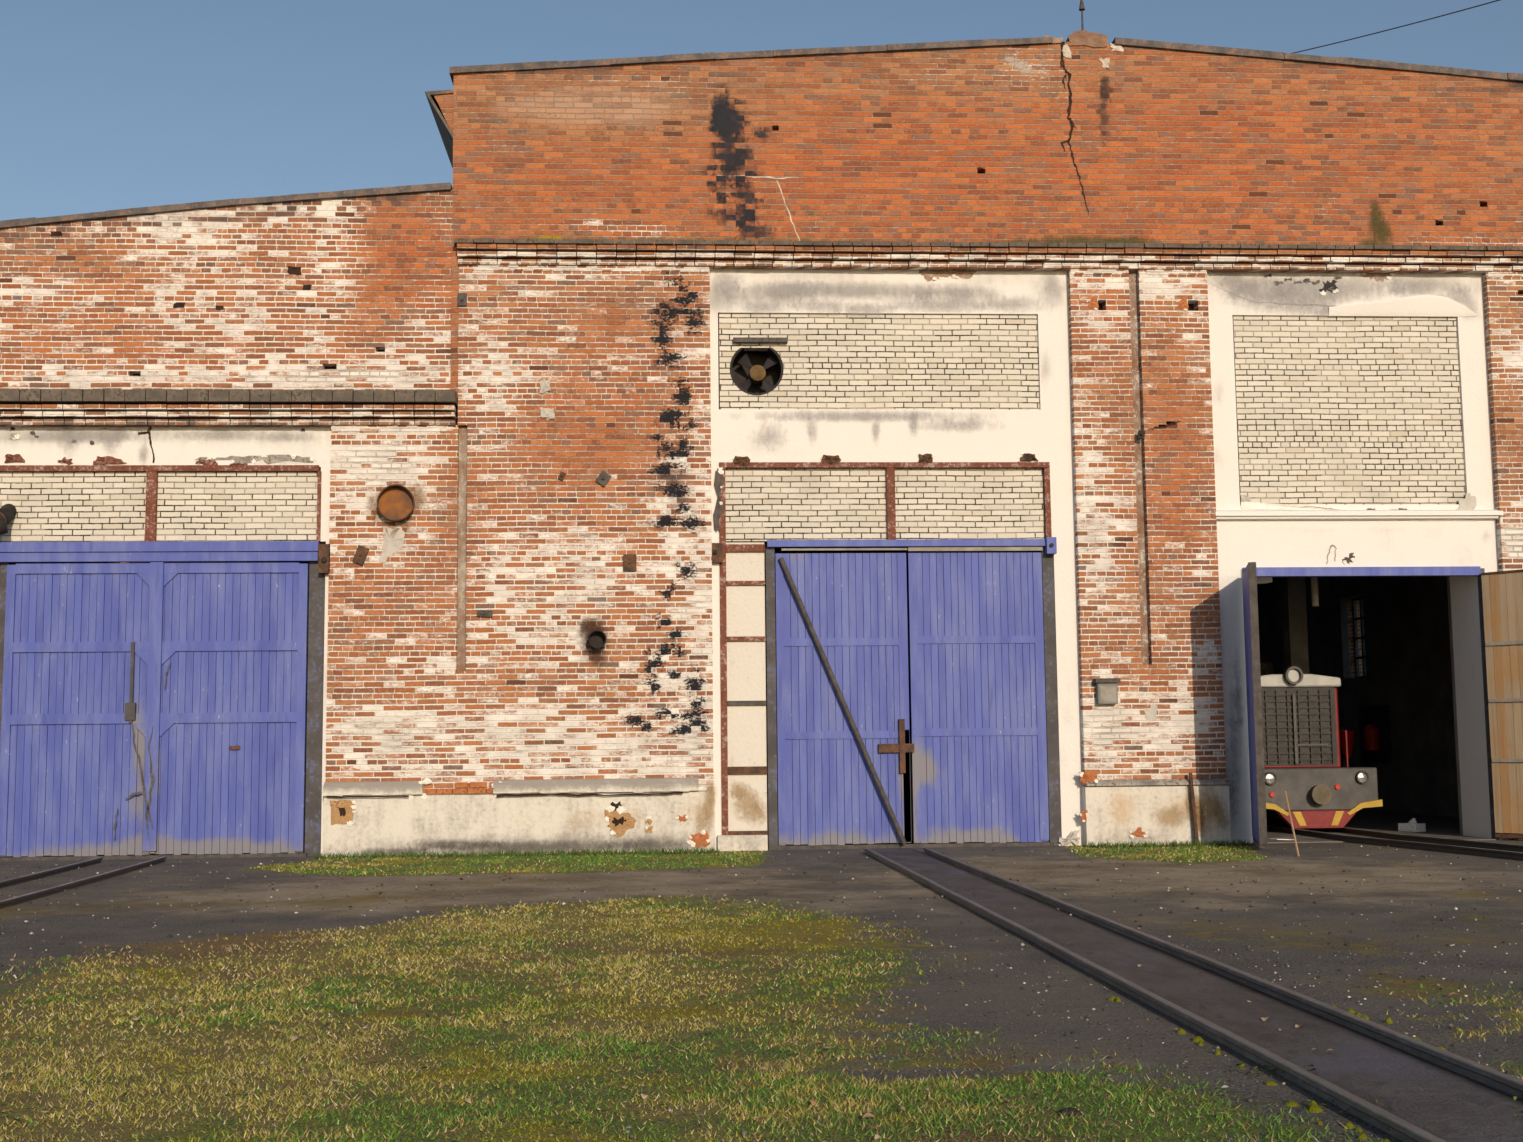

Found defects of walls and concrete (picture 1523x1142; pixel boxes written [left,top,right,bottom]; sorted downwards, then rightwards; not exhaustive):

leakage [707,100,775,237]
crack [1060,41,1089,215]